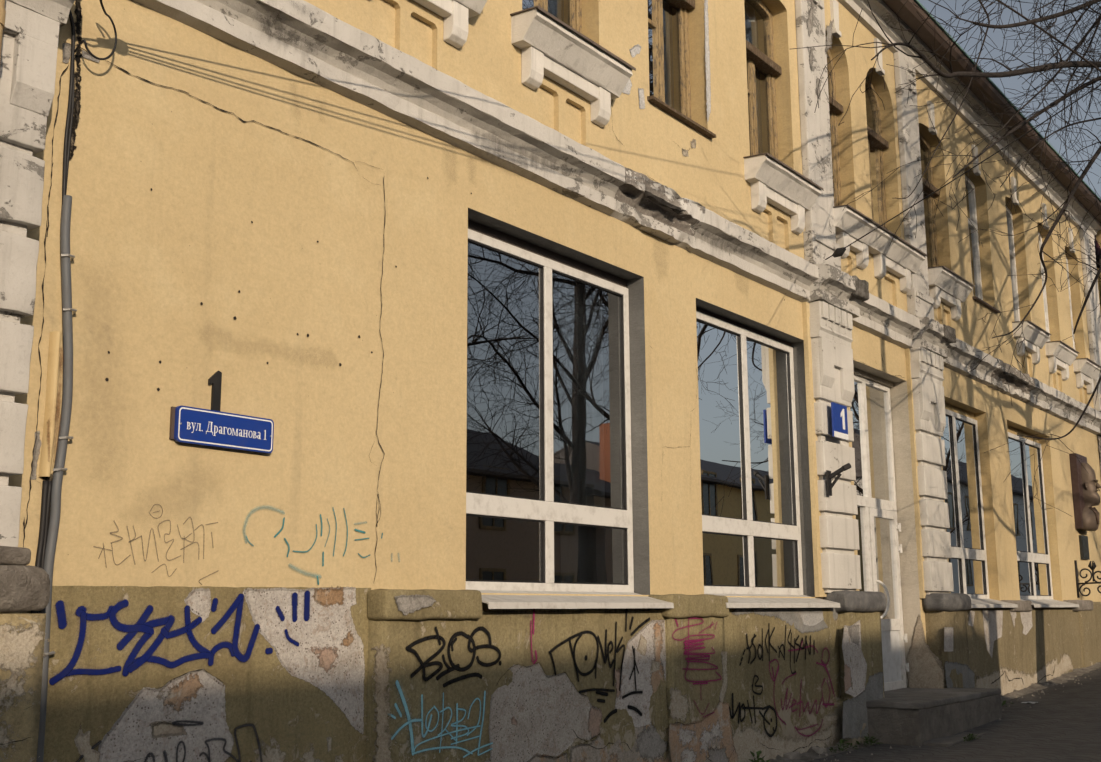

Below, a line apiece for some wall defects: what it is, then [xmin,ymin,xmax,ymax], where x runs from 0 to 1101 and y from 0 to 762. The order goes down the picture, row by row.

peeling [806,0,834,98]
crack [23,41,386,584]
peeling [0,621,49,760]
peeling [74,669,234,762]
peeling [184,588,211,622]
peeling [243,585,394,762]
peeling [395,594,437,615]
peeling [484,619,843,762]
peeling [842,620,867,697]
spalling [968,610,1073,696]